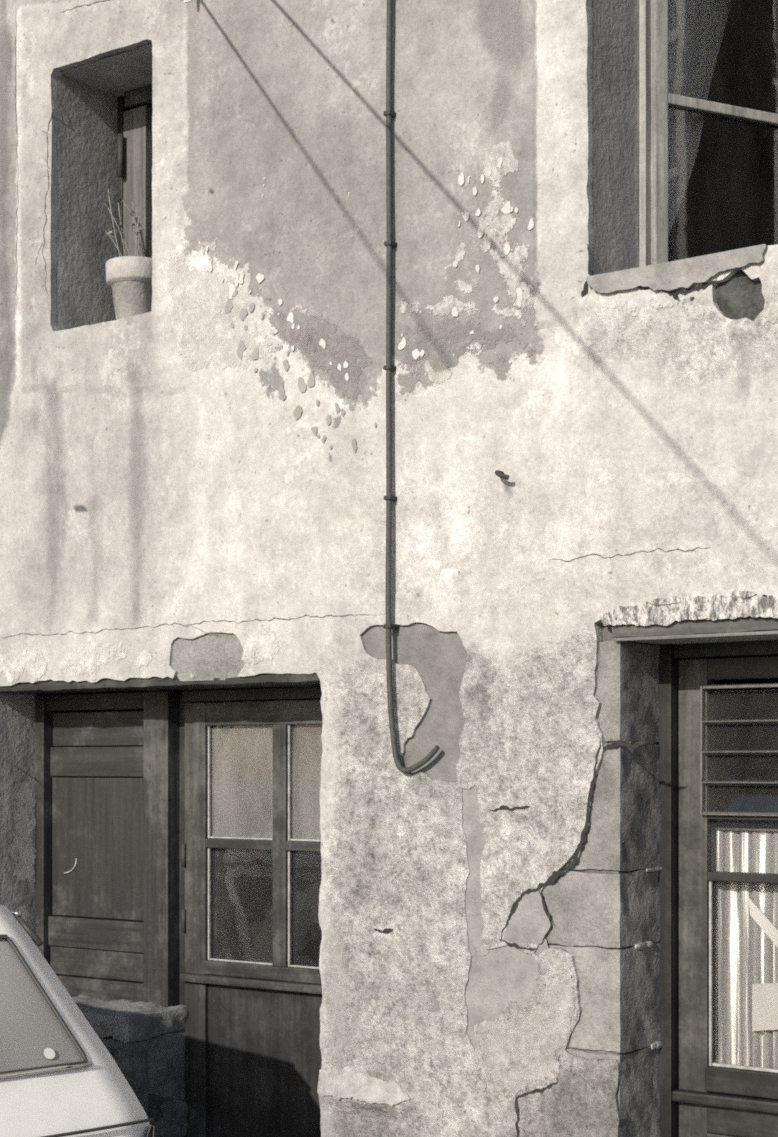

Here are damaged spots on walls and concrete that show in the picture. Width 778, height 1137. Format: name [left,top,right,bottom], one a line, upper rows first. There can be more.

peeling [397,140,535,400]
peeling [613,295,705,319]
spalling [716,270,778,333]
peeling [166,238,372,449]
crack [551,547,711,562]
spalling [599,590,778,626]
peeling [0,649,46,683]
peeling [60,643,151,679]
spalling [171,624,279,681]
spalling [362,623,489,956]
spalling [503,890,550,944]
crack [515,1055,560,1137]